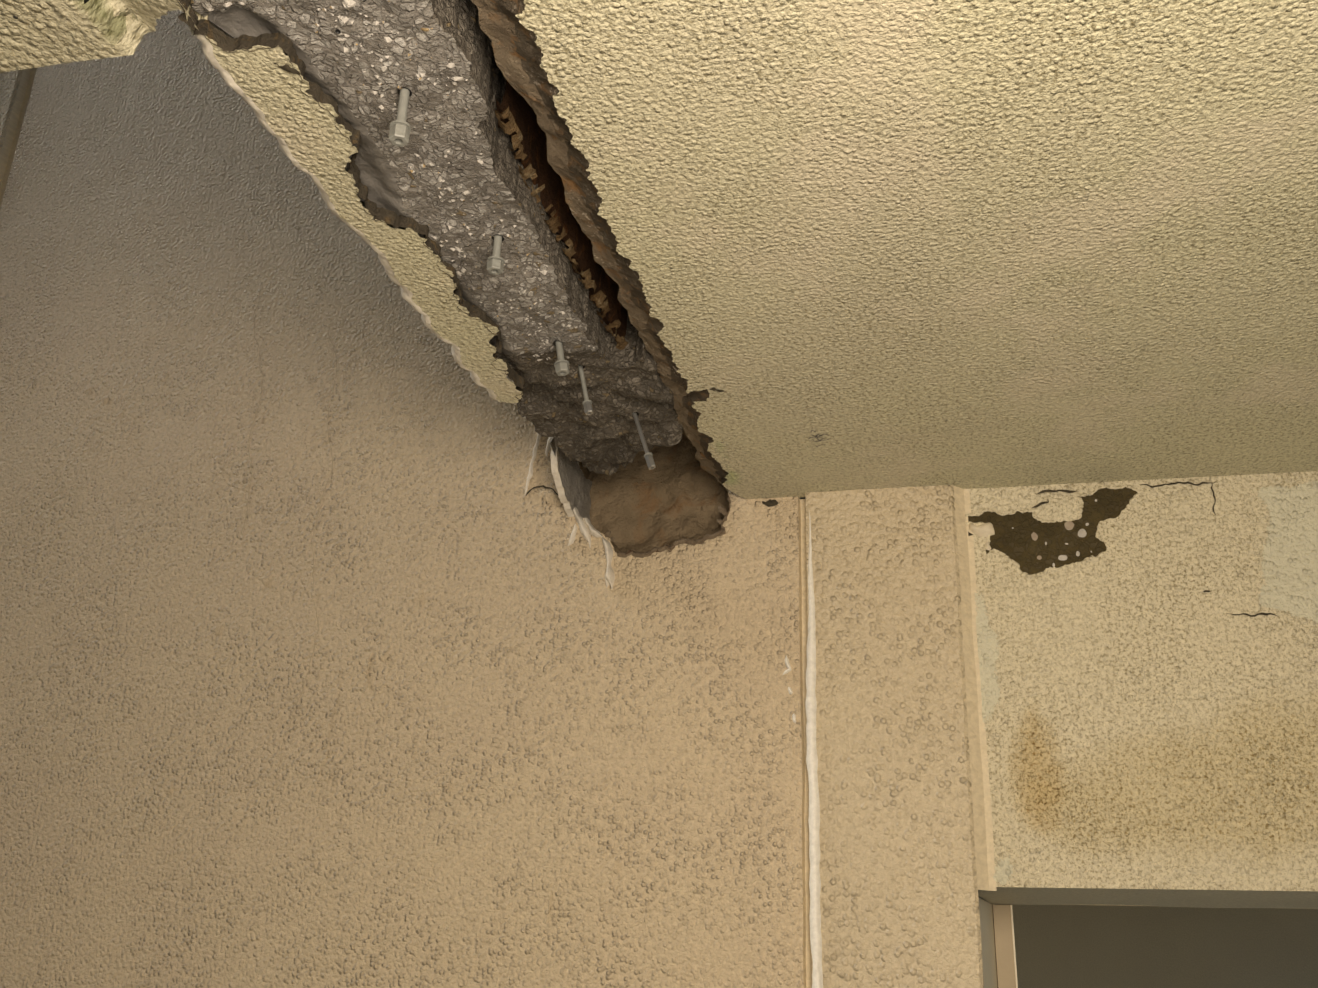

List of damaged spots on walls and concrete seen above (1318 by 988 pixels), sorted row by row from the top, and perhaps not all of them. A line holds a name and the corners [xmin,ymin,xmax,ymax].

spalling [177,0,731,590]
spalling [965,484,1142,578]
crack [1140,481,1216,514]